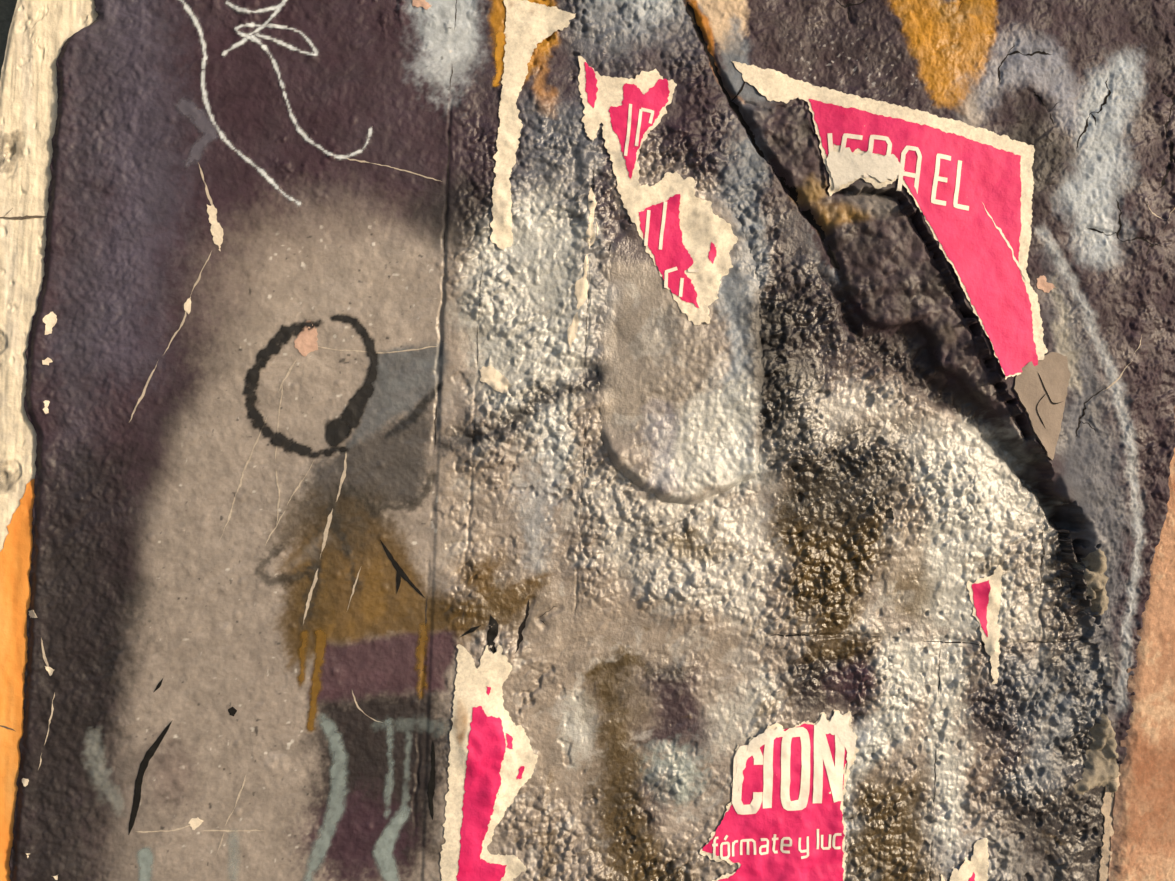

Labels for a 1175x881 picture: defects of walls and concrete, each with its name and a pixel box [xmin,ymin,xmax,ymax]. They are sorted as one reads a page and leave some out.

crack [998,46,1052,85]
crack [686,2,840,270]
crack [1076,78,1111,149]
peeling [567,254,589,347]
flaking render [734,101,1071,466]
crack [1038,519,1046,598]
peeling [0,478,38,881]
peeling [189,817,203,830]